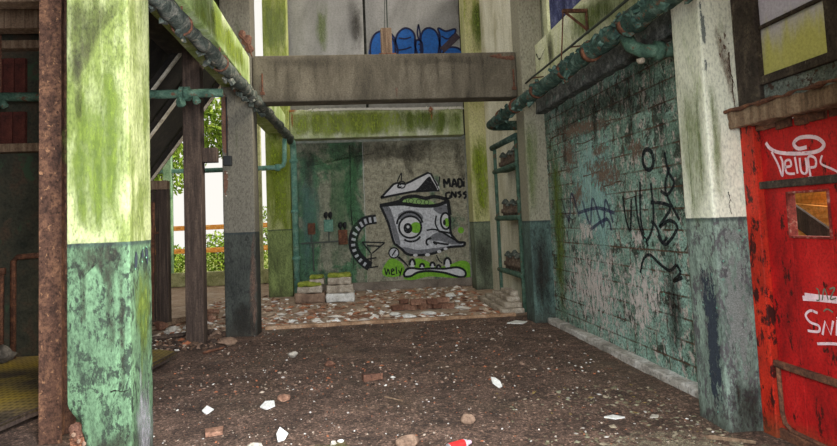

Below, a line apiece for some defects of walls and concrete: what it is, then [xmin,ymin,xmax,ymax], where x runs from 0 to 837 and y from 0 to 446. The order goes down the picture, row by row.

damp [94,73,116,221]
damp [295,113,381,134]
peeling [550,116,624,207]
peeling [564,218,666,342]